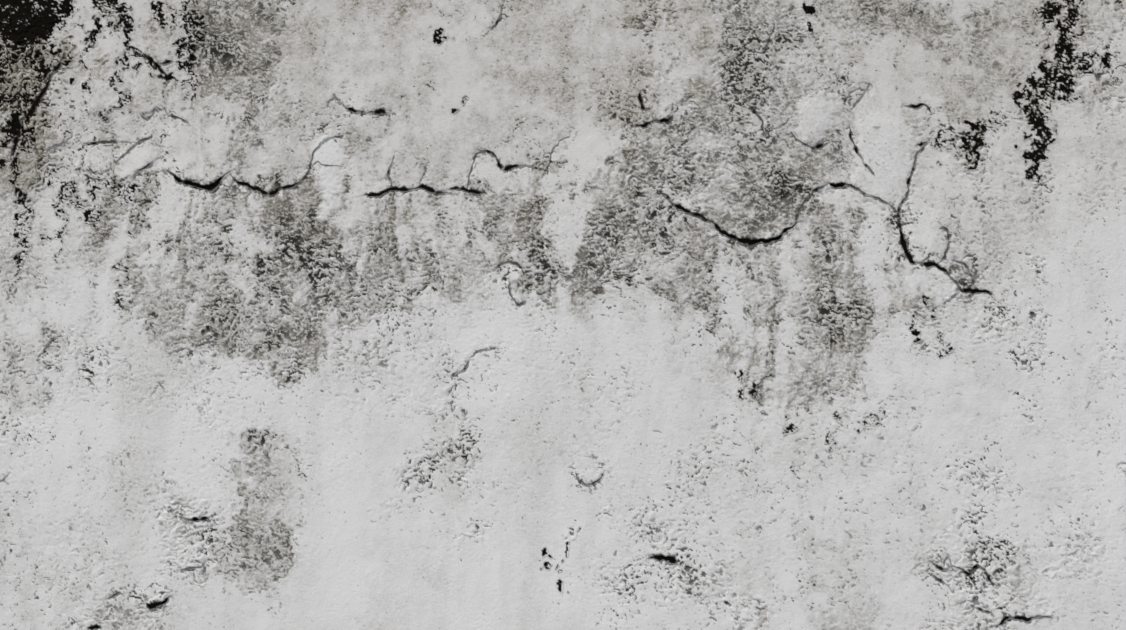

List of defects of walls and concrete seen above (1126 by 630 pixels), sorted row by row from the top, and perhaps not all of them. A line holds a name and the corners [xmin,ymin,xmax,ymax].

crack [742,27,774,54]
leakage [1113,0,1126,30]
leakage [783,0,1114,187]
leakage [0,0,210,294]
crack [44,96,387,196]
crack [364,136,569,198]
crack [660,81,993,295]
leakage [112,229,138,307]
leakage [0,319,60,417]
leakage [733,368,774,401]
leakage [781,406,799,437]
leakage [824,394,880,459]